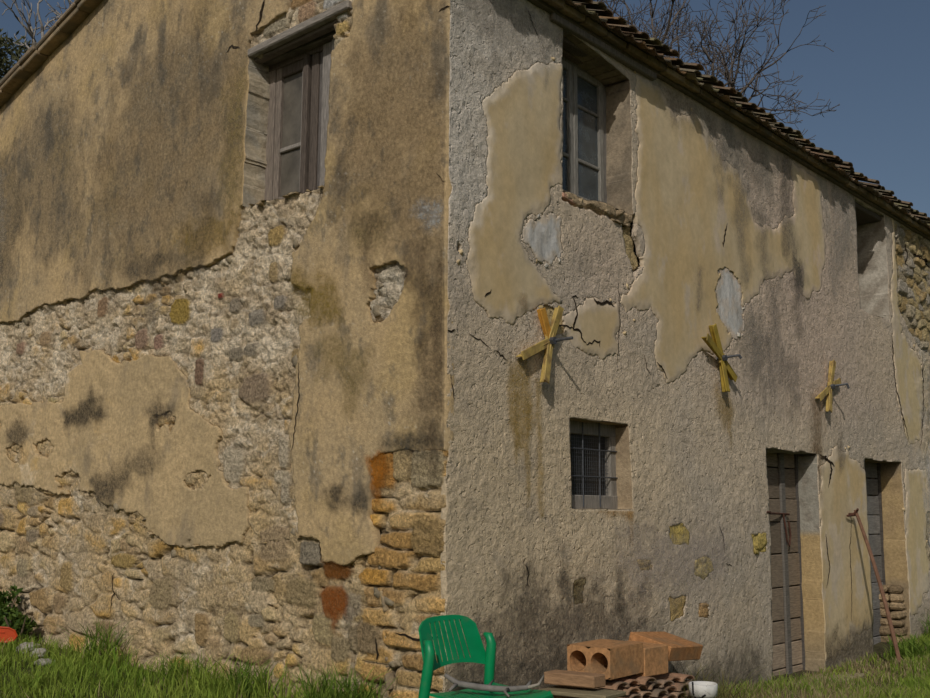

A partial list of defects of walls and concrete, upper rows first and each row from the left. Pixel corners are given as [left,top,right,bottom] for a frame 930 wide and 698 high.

crack [256,0,265,31]
peeling [457,57,826,383]
crack [559,284,620,365]
flaking render [895,223,930,356]
leakage [64,392,102,425]
flaking render [0,188,449,698]
crack [291,363,300,450]
rust [321,562,350,626]
crack [375,633,438,663]